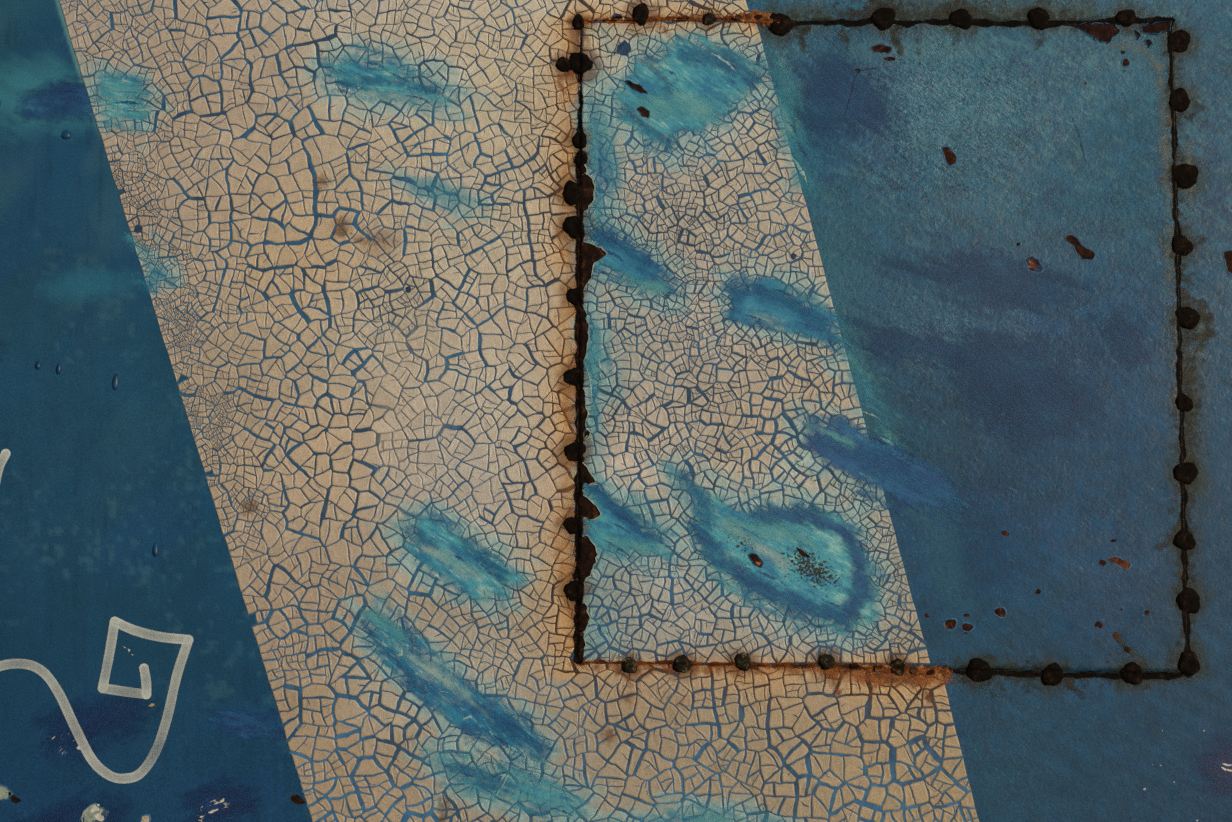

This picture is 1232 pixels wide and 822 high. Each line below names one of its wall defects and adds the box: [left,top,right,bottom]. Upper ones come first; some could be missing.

corrosion [718,9,781,27]
crack [59,0,978,822]
corrosion [777,663,951,701]
peeling [0,784,21,803]
peeling [79,802,109,822]